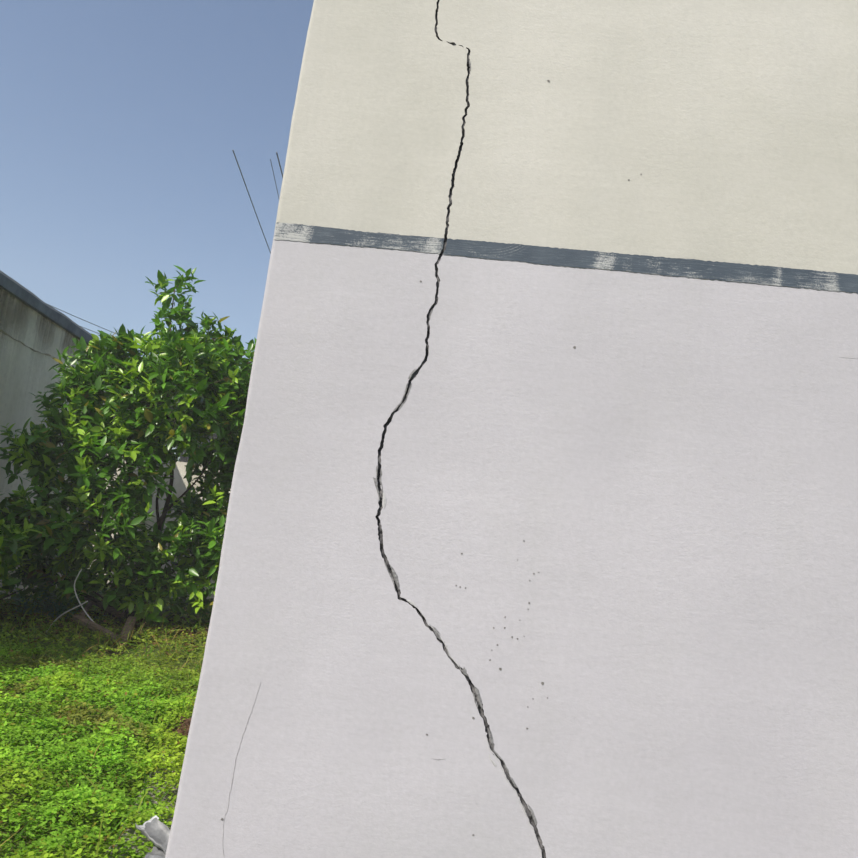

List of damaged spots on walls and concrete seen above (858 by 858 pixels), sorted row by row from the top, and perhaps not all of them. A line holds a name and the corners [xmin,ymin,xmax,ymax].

crack [373,0,546,858]